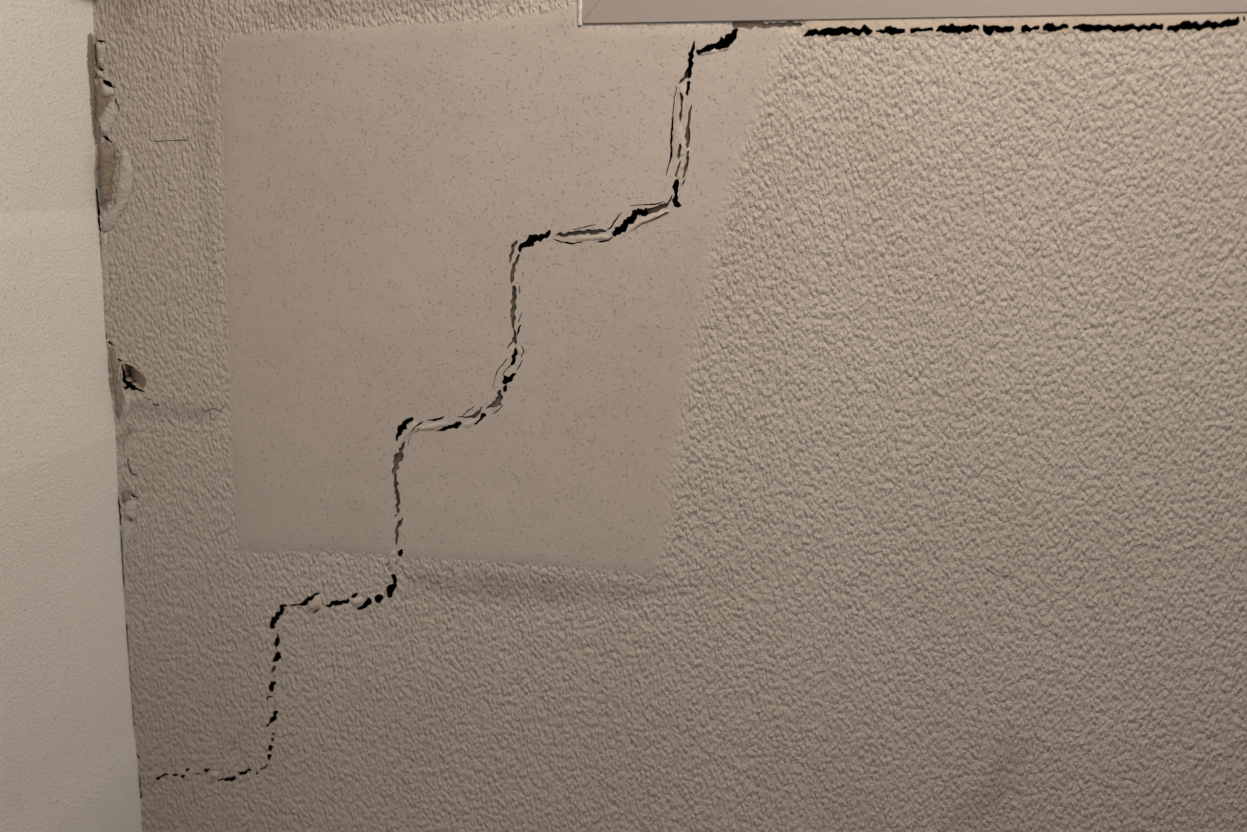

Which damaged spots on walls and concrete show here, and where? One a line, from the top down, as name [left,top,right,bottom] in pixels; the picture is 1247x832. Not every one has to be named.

crack [803,16,1245,37]
flaking render [87,33,120,144]
crack [94,188,102,252]
flaking render [107,341,160,419]
crack [144,20,803,791]
crack [117,495,125,586]
crack [126,624,134,726]